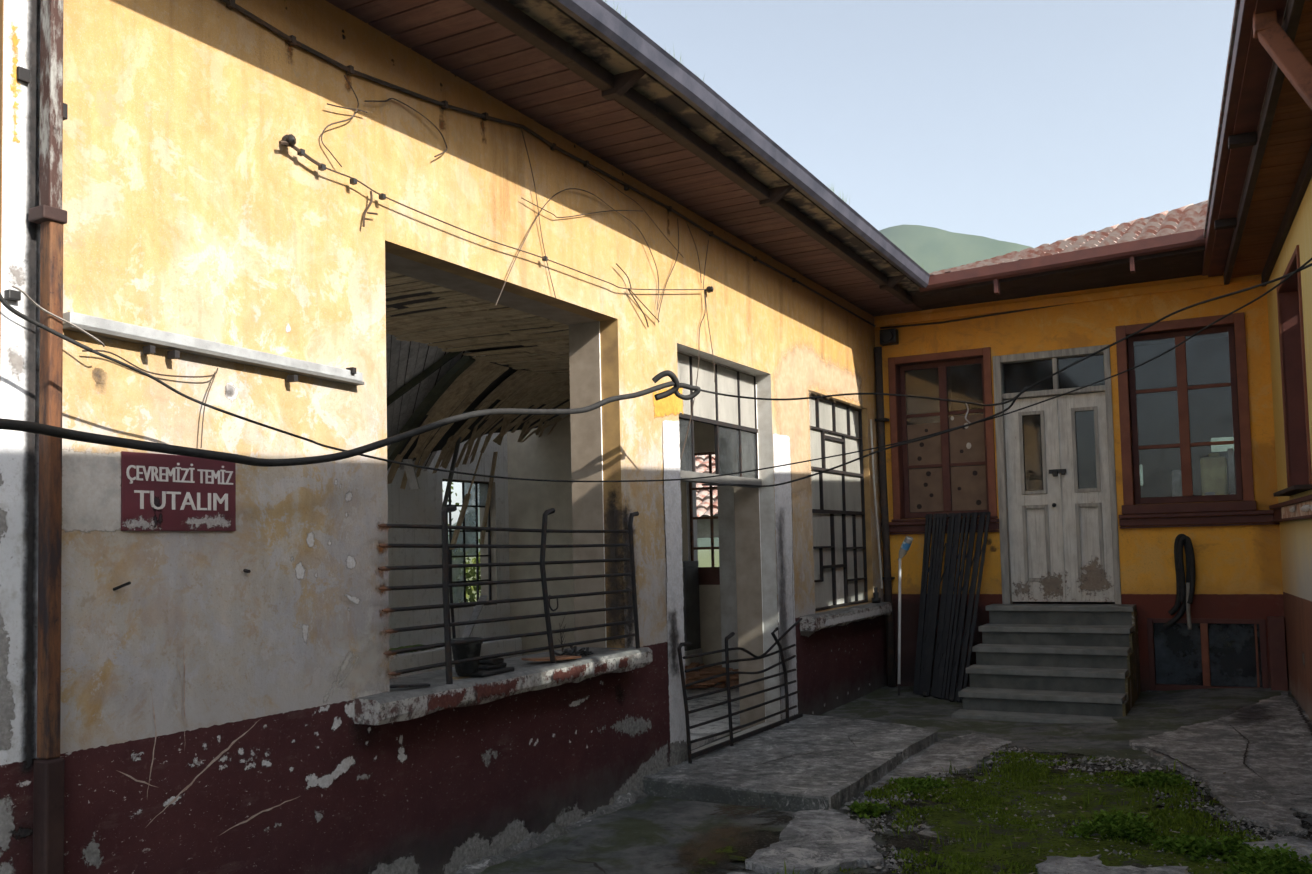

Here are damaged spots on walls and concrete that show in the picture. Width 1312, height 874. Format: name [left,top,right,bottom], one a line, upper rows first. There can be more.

peeling [1012,557,1114,601]
spalling [0,614,15,751]
peeling [425,677,519,715]
peeling [551,657,629,707]
peeling [305,701,377,760]
peeling [289,755,370,790]
spalling [555,740,688,827]
peeling [0,780,32,874]
spalling [369,853,420,874]
spalling [443,818,541,874]